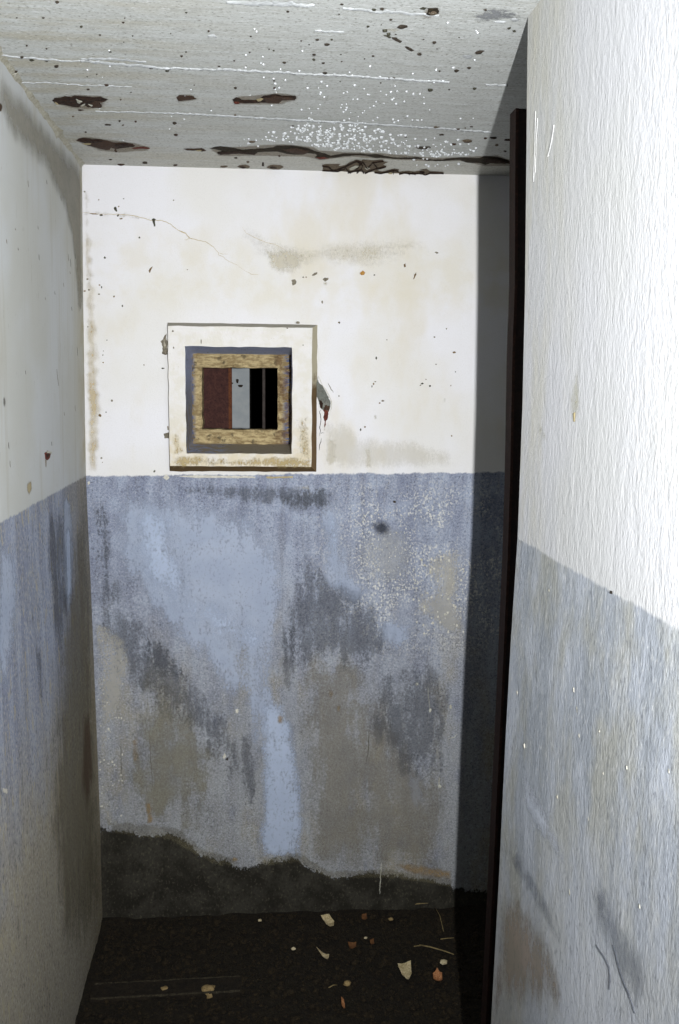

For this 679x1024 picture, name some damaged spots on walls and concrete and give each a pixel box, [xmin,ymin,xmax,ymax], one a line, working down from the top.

spalling [52,74,132,117]
spalling [233,80,296,116]
spalling [76,131,150,166]
crack [83,212,258,275]
damp [84,500,487,919]